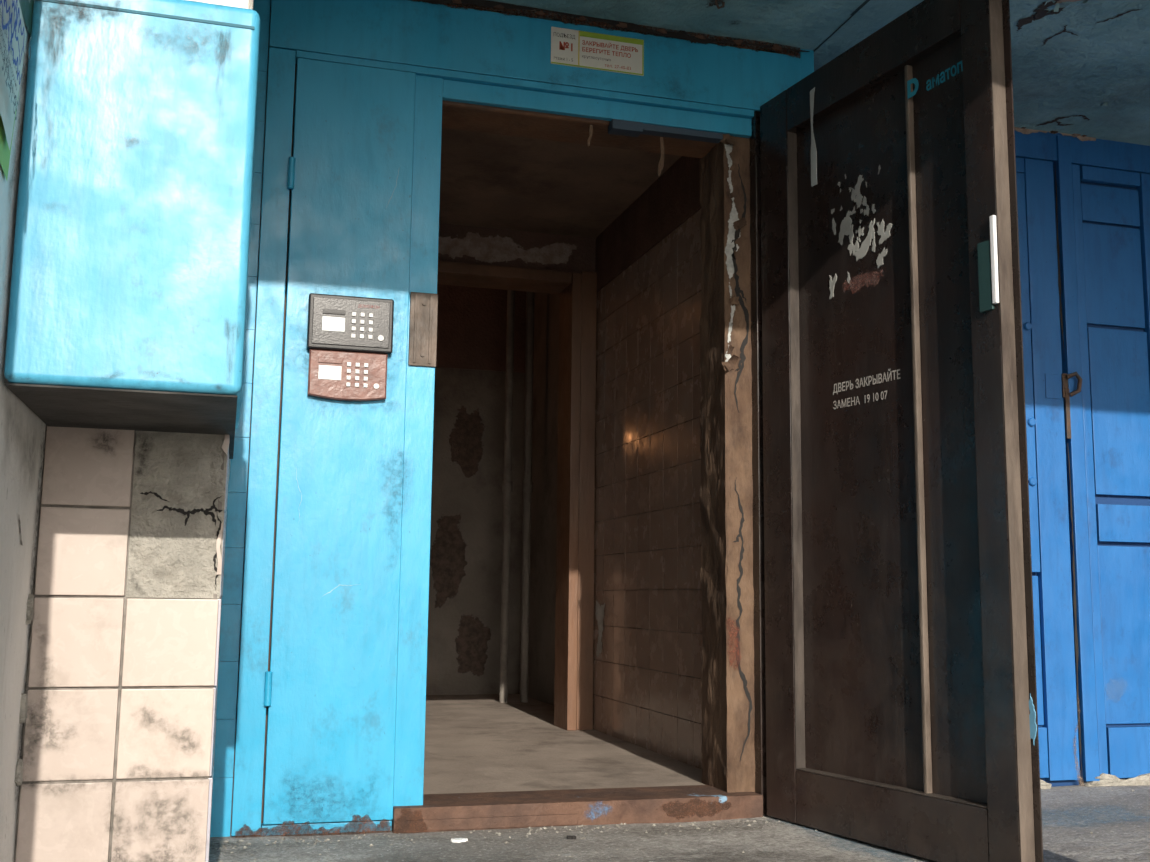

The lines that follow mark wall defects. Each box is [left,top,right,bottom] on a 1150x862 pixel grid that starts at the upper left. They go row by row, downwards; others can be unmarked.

spalling [1016,0,1096,31]
peeling [438,232,578,265]
peeling [721,134,748,371]
peeling [449,406,485,478]
peeling [126,431,227,598]
crack [140,491,228,590]
peeling [430,514,467,608]
peeling [455,614,491,676]
crack [734,480,752,761]
corrosion [235,806,428,838]